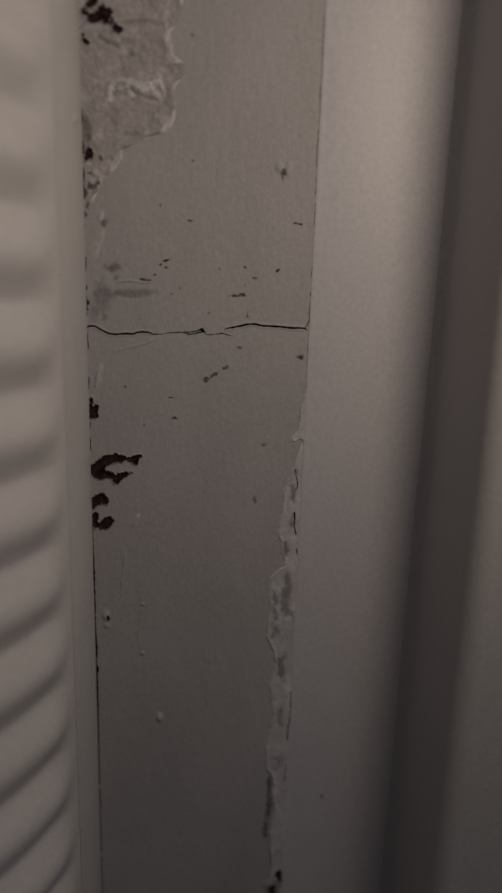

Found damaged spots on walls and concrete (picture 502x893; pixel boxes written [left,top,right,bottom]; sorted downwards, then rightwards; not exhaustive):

crack [79,112,87,198]
peeling [78,0,184,205]
crack [85,257,312,348]
peeling [259,393,306,893]